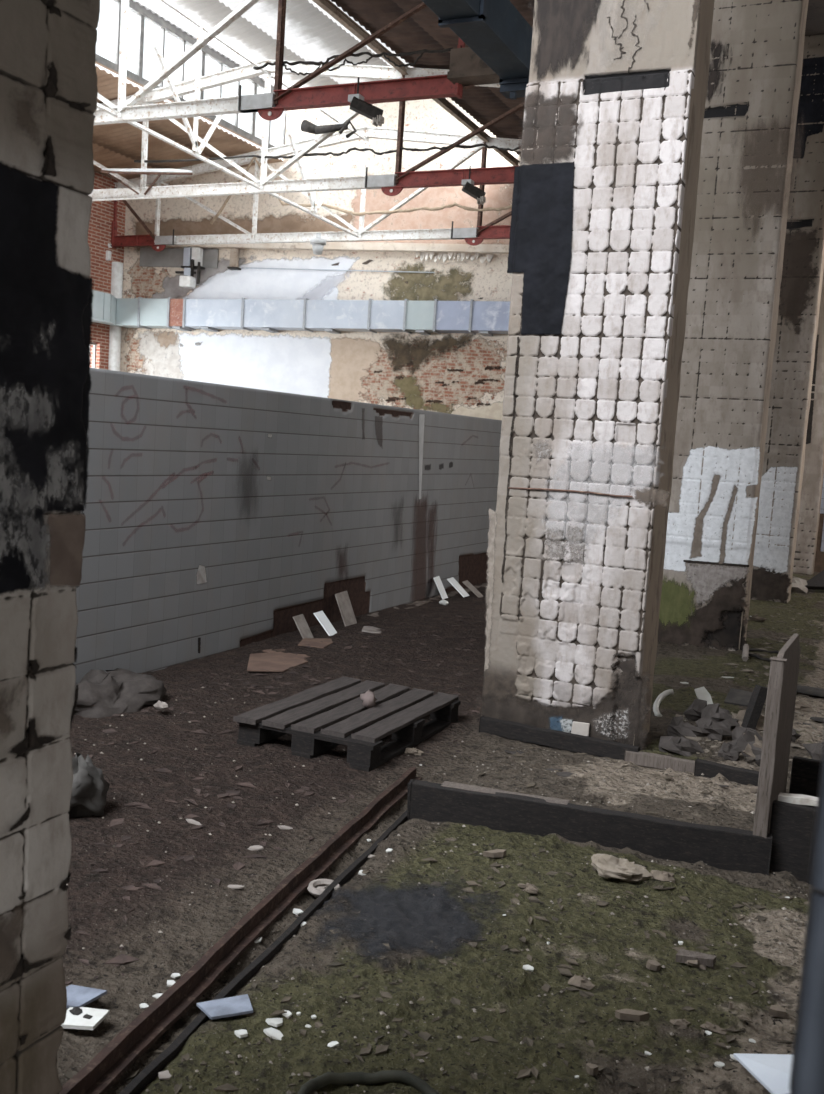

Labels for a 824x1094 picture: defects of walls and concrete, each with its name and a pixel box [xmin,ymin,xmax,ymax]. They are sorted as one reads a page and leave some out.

crack [607,0,649,74]
water stain [519,0,601,165]
water stain [383,263,474,301]
flaking render [327,336,507,417]
peeling [0,386,84,590]
water stain [658,565,791,651]